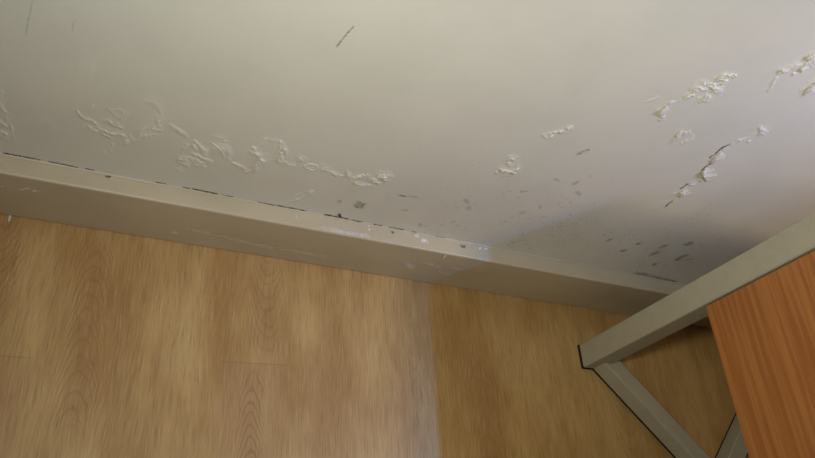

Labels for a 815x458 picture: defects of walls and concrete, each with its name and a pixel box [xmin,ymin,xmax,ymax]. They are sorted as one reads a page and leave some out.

peeling [655,71,740,122]
peeling [767,47,815,98]